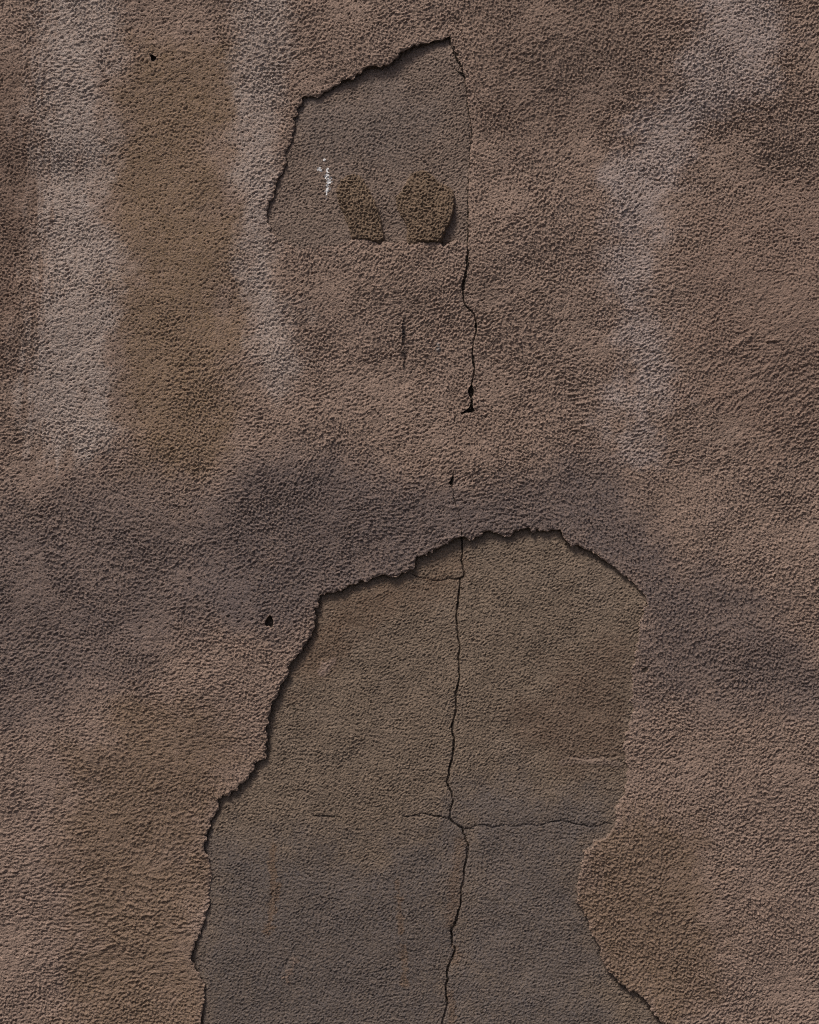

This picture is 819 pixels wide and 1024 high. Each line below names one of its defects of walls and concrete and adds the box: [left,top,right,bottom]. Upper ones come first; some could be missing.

spalling [267,36,471,252]
crack [449,40,477,417]
spalling [191,527,663,1024]
crack [404,474,610,1012]